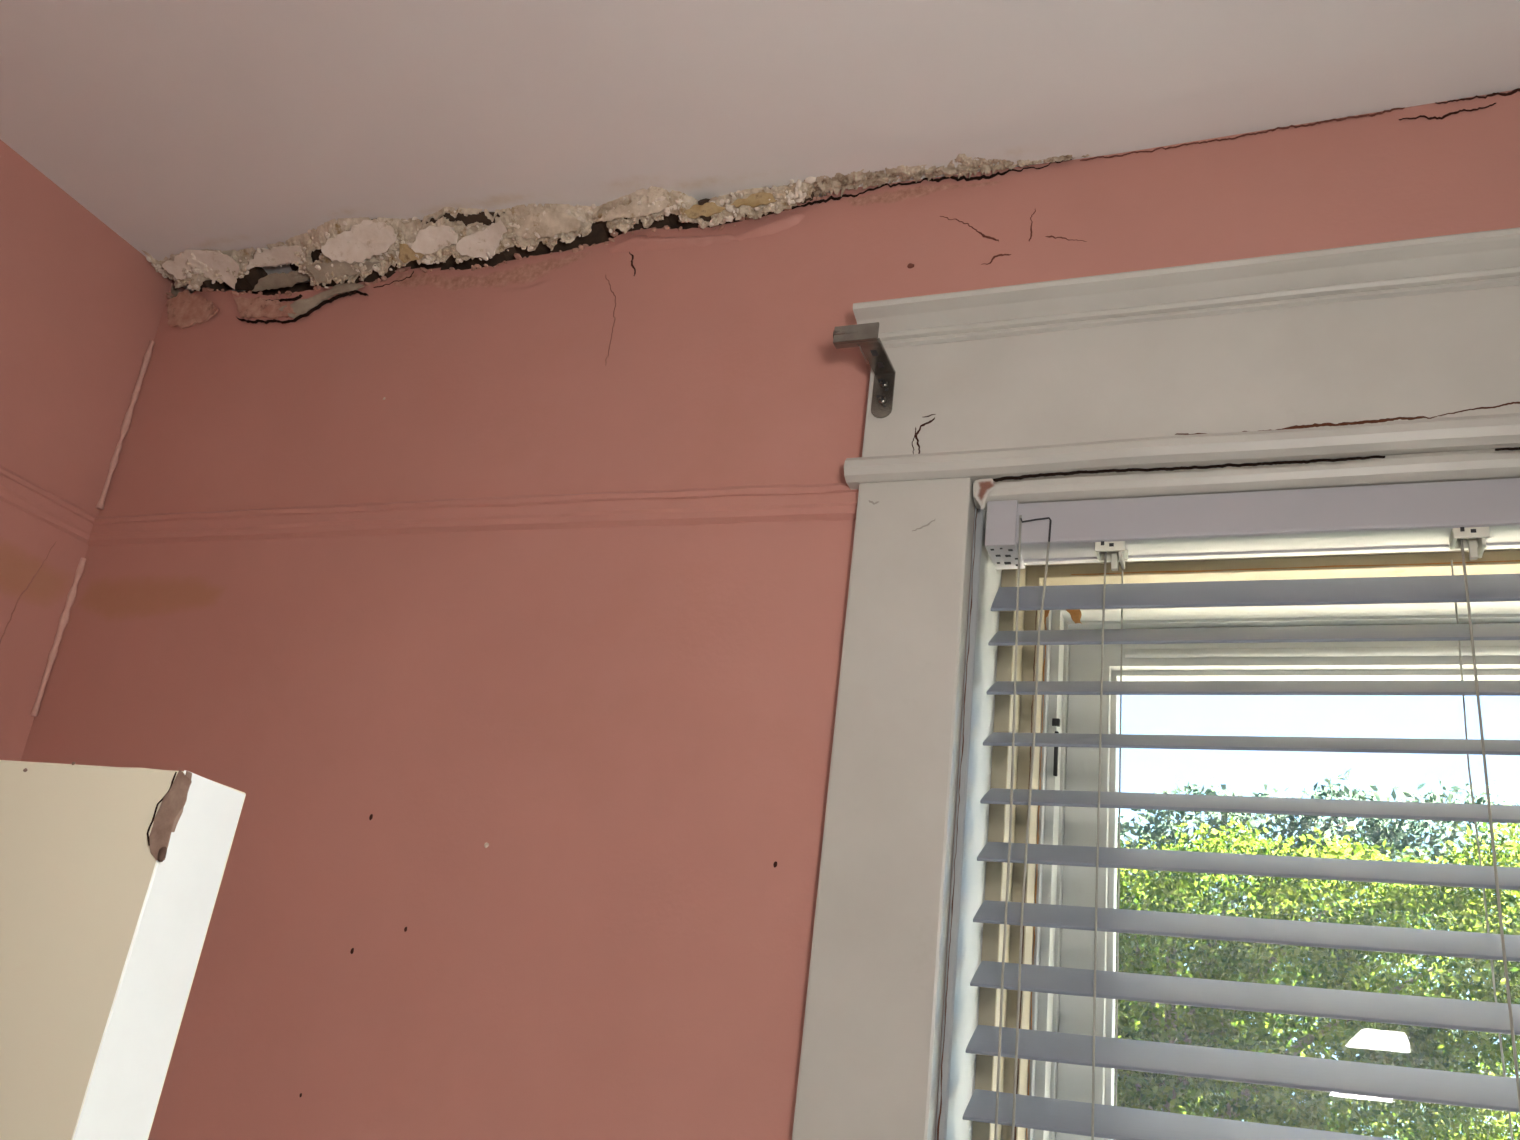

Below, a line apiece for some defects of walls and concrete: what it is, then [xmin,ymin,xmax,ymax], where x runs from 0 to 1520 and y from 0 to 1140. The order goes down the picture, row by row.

crack [1080,88,1520,161]
spalling [142,154,1090,329]
crack [940,210,1087,265]
crack [238,271,414,324]